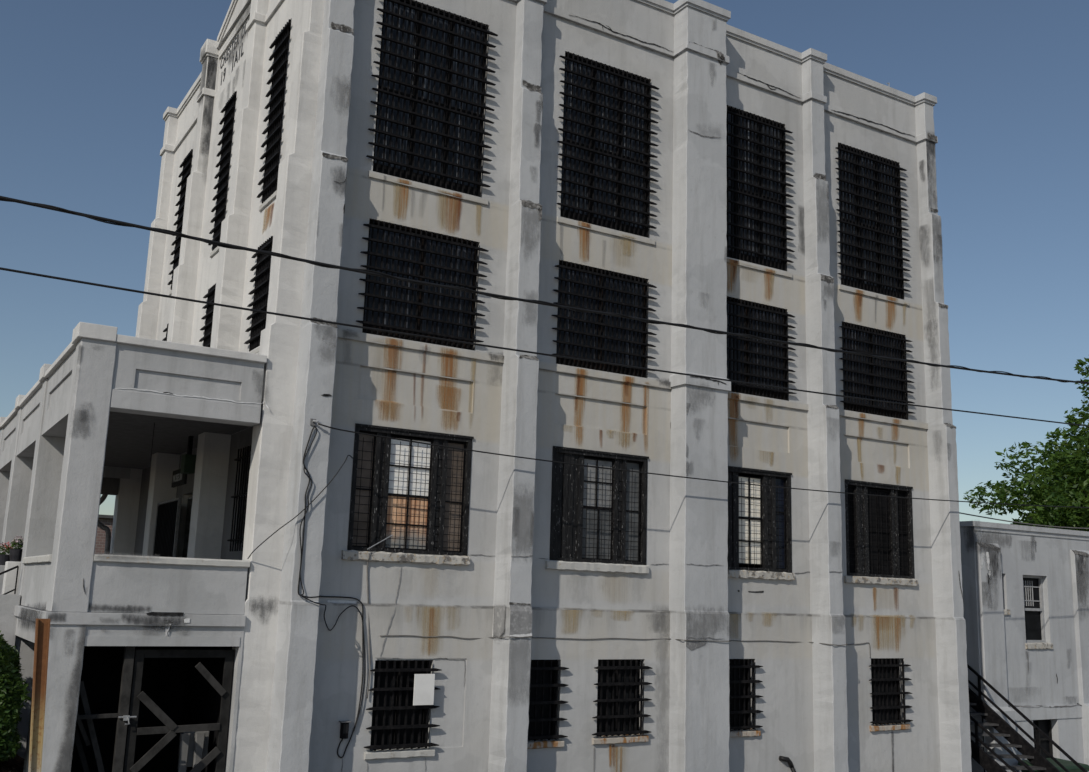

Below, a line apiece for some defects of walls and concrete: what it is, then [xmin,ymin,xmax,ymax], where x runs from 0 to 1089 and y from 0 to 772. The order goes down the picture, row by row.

crack [570,15,799,98]
rust [442,192,462,229]
rust [728,259,738,291]
water stain [73,411,88,433]
rust [379,338,402,419]
rust [439,349,476,426]
rust [575,368,586,442]
rust [600,376,648,446]
rust [728,393,739,457]
water stain [967,526,1009,596]
water stain [1076,554,1086,594]
rust [873,588,912,647]